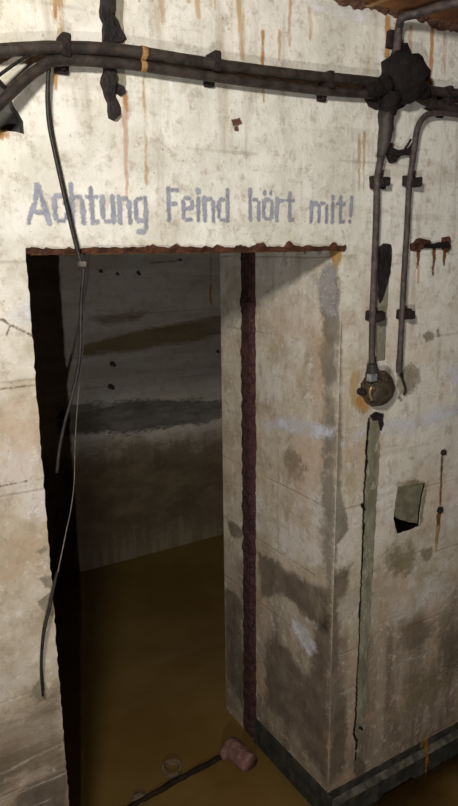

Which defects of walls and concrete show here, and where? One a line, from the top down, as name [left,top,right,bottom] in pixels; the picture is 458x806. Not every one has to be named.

corrosion [140,45,149,83]
corrosion [334,0,405,35]
corrosion [416,16,458,85]
damp [82,317,221,355]
damp [321,280,342,386]
damp [57,399,222,436]
corrosion [435,456,443,552]
damp [259,396,357,778]
crack [353,418,370,773]
damp [0,773,66,806]